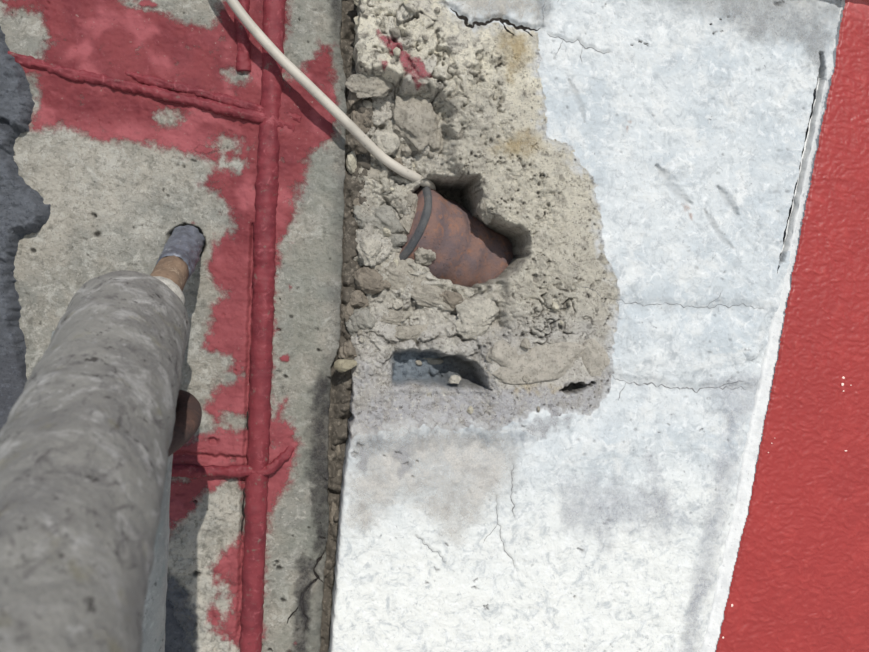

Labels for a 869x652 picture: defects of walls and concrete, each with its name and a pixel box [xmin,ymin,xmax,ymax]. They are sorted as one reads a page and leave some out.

crack [450,1,607,61]
crack [777,77,818,273]
spalling [0,0,621,652]
crack [287,0,372,652]
crack [586,287,752,309]
crack [611,374,745,401]